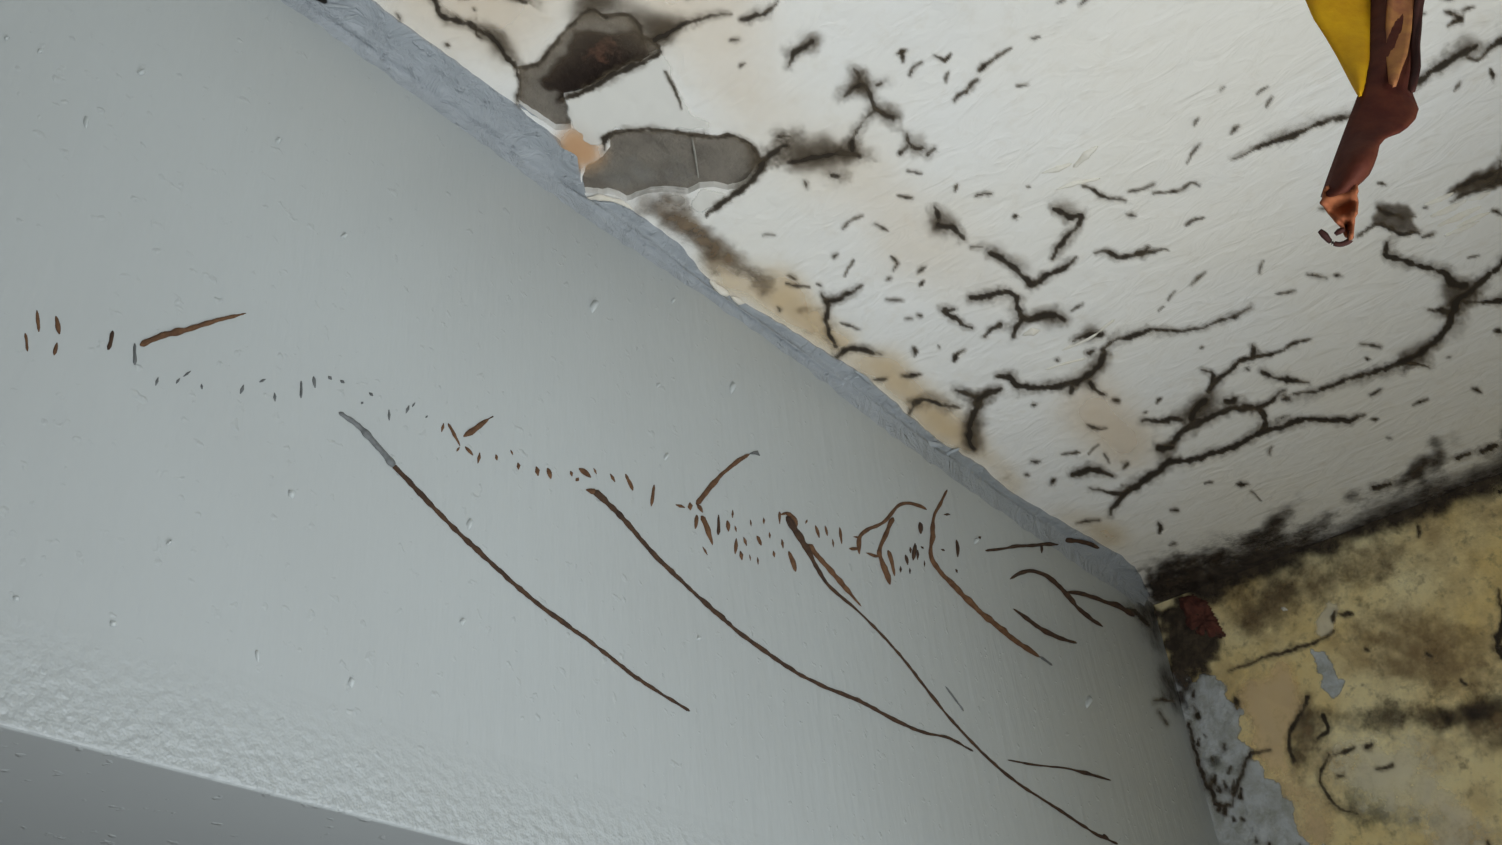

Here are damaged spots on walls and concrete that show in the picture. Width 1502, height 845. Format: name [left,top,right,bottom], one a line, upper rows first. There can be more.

crack [397,0,521,105]
spalling [514,8,762,212]
crack [651,4,777,67]
crack [1417,0,1502,90]
leakage [649,195,802,318]
crack [706,37,1502,546]
leakage [875,362,967,444]
leakage [1127,439,1502,725]
peeling [1173,664,1327,845]
leakage [1287,695,1358,815]
leakage [1423,698,1502,746]